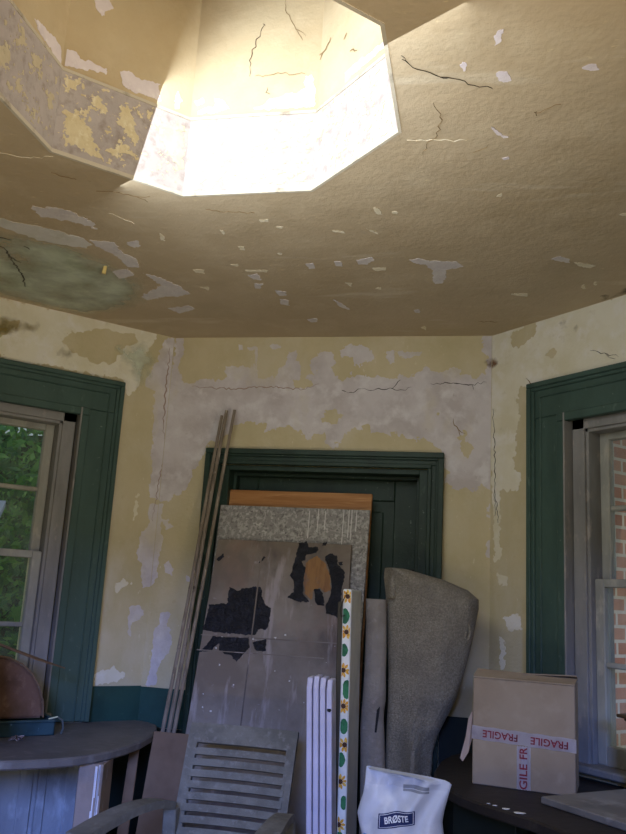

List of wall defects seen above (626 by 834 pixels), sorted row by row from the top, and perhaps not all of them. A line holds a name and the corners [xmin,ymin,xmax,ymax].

peeling [0,11,187,179]
crack [249,24,305,94]
crack [401,55,493,89]
crack [413,106,487,154]
crack [0,237,30,286]
leakage [0,241,132,311]
peeling [0,206,141,279]
leakage [0,319,17,333]
flaking render [0,295,626,593]
crack [491,411,499,518]
flaking render [94,665,125,685]
flaking render [145,612,172,686]